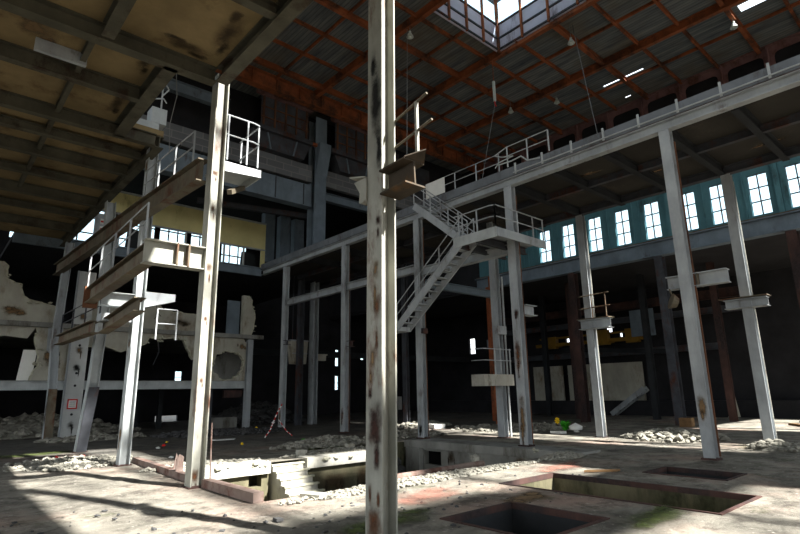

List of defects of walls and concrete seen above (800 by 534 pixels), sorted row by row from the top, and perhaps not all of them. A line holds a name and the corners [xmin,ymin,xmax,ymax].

water stain [168,34,203,59]
spalling [3,261,56,308]
corrosion [673,141,721,457]
corrosion [368,332,378,397]
corrosion [514,242,534,445]
corrosion [369,406,381,468]
corrosion [368,487,379,534]